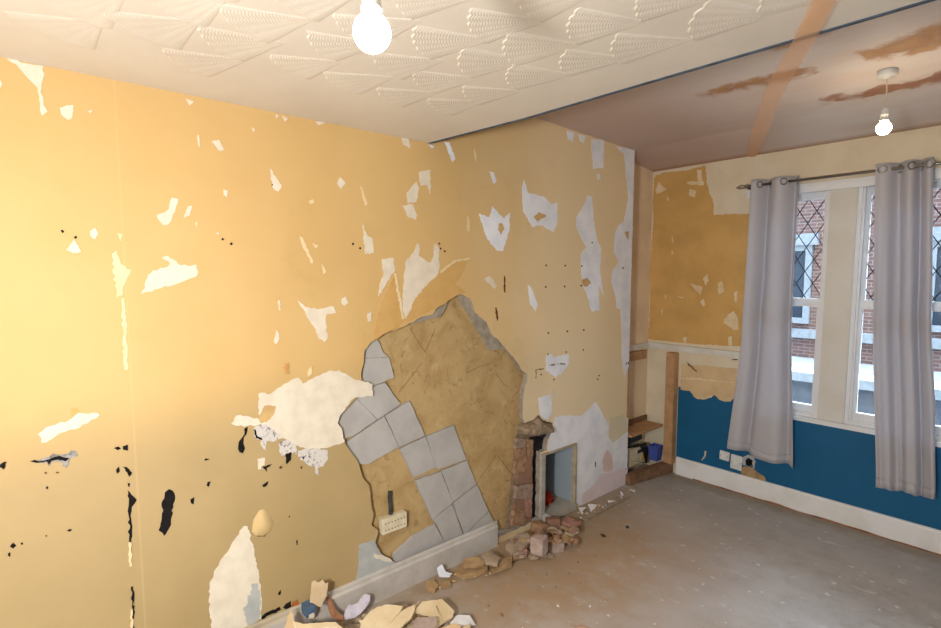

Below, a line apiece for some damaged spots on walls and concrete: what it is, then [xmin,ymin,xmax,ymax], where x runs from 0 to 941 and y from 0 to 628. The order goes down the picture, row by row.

damp [845,20,941,63]
damp [691,62,824,102]
damp [806,68,941,107]
peeling [687,170,704,197]
peeling [567,131,635,377]
peeling [484,276,538,311]
peeling [690,274,739,345]
flaking render [231,294,628,579]
flaking render [209,526,262,628]